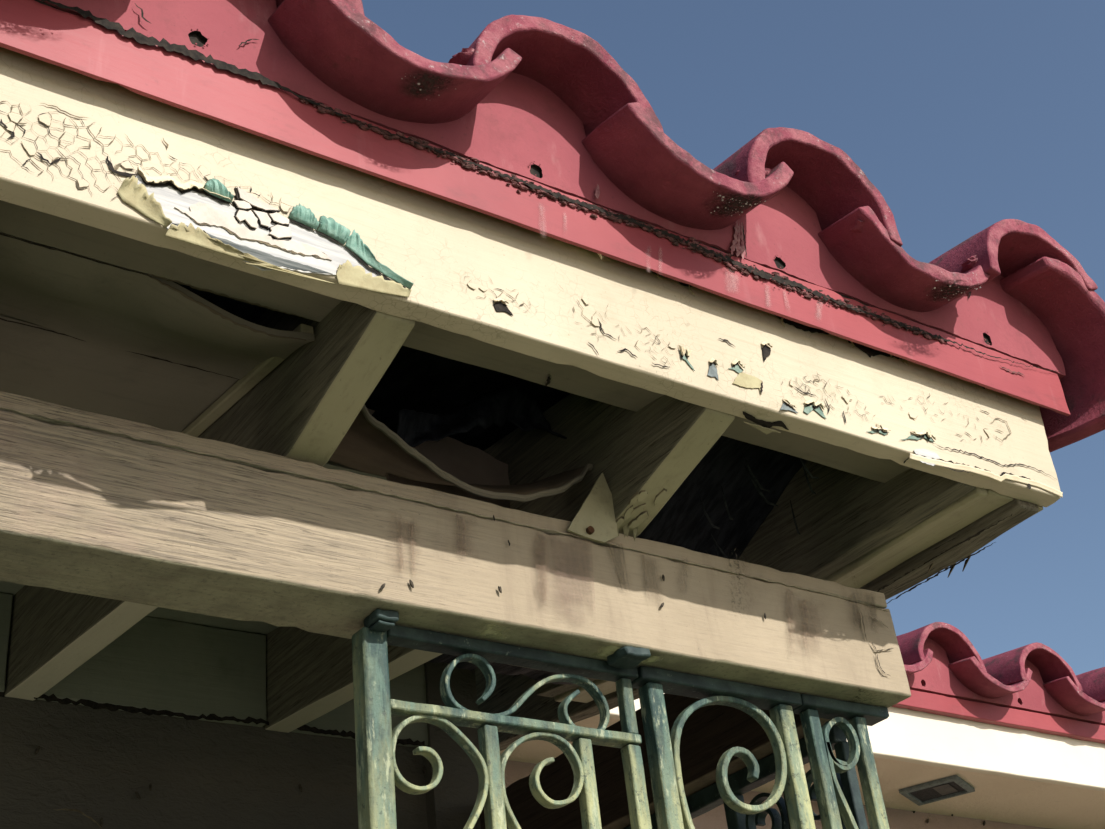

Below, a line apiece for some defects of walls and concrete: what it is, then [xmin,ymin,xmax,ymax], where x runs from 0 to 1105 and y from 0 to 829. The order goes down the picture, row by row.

crack [0,0,1062,375]
peeling [117,165,414,298]
water stain [712,193,762,259]
water stain [932,280,984,301]
peeling [678,344,695,371]
peeling [707,357,763,395]
peeling [761,341,773,361]
peeling [743,398,827,435]
crack [782,374,1063,498]